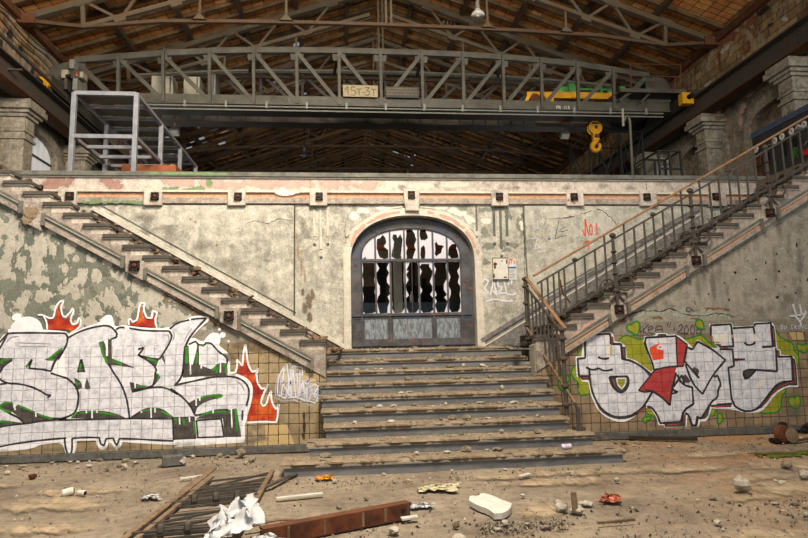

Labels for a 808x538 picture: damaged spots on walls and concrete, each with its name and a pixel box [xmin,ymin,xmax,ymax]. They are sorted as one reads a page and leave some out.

peeling [349,206,400,247]
peeling [0,205,228,332]
leakage [301,289,315,322]
crack [618,305,739,322]